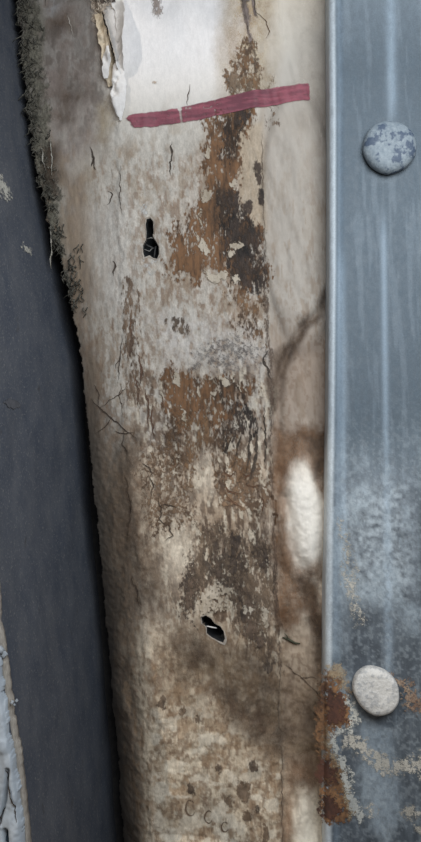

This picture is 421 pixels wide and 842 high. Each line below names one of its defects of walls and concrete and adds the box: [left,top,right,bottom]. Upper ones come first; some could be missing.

peeling [90,0,127,121]
crack [241,0,270,42]
peeling [160,107,274,348]
water stain [188,316,319,410]
peeling [135,360,278,677]
corrosion [313,664,421,826]
corrosion [400,804,421,834]